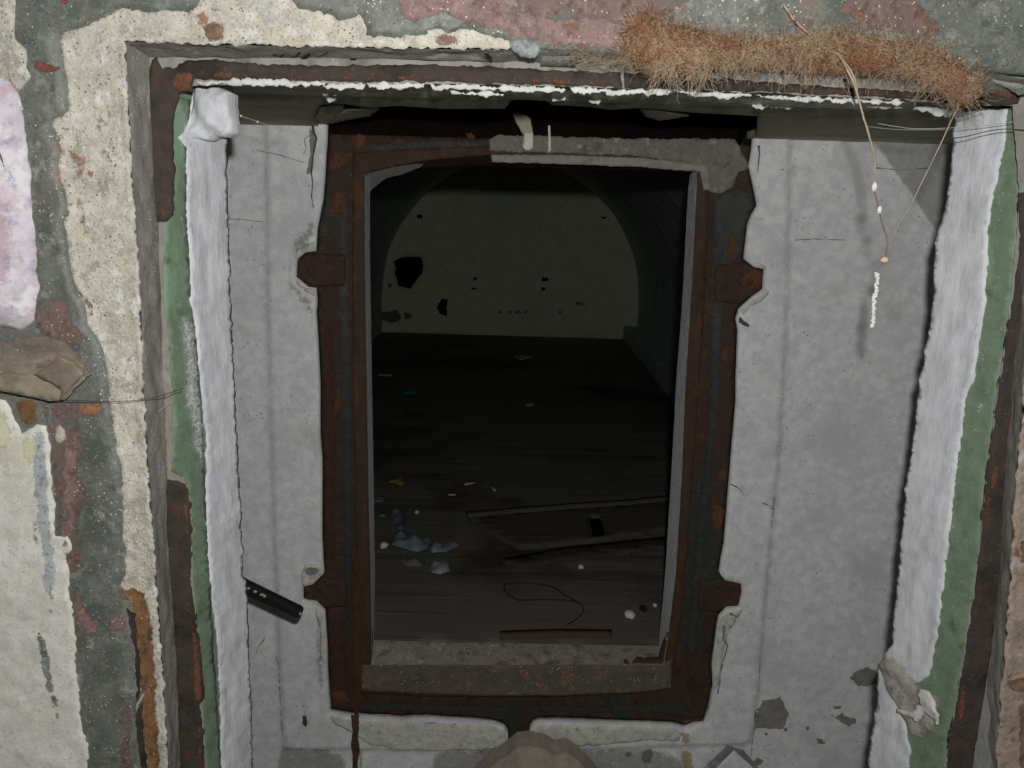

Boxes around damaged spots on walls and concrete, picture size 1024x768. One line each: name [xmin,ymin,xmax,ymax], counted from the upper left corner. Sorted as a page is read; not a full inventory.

spalling [196,77,959,157]
rust [322,327,342,560]
spalling [0,0,686,768]
rust [118,587,160,768]
rust [331,635,362,768]
peeling [753,697,789,735]
peeling [850,667,878,687]
peeling [896,689,939,725]